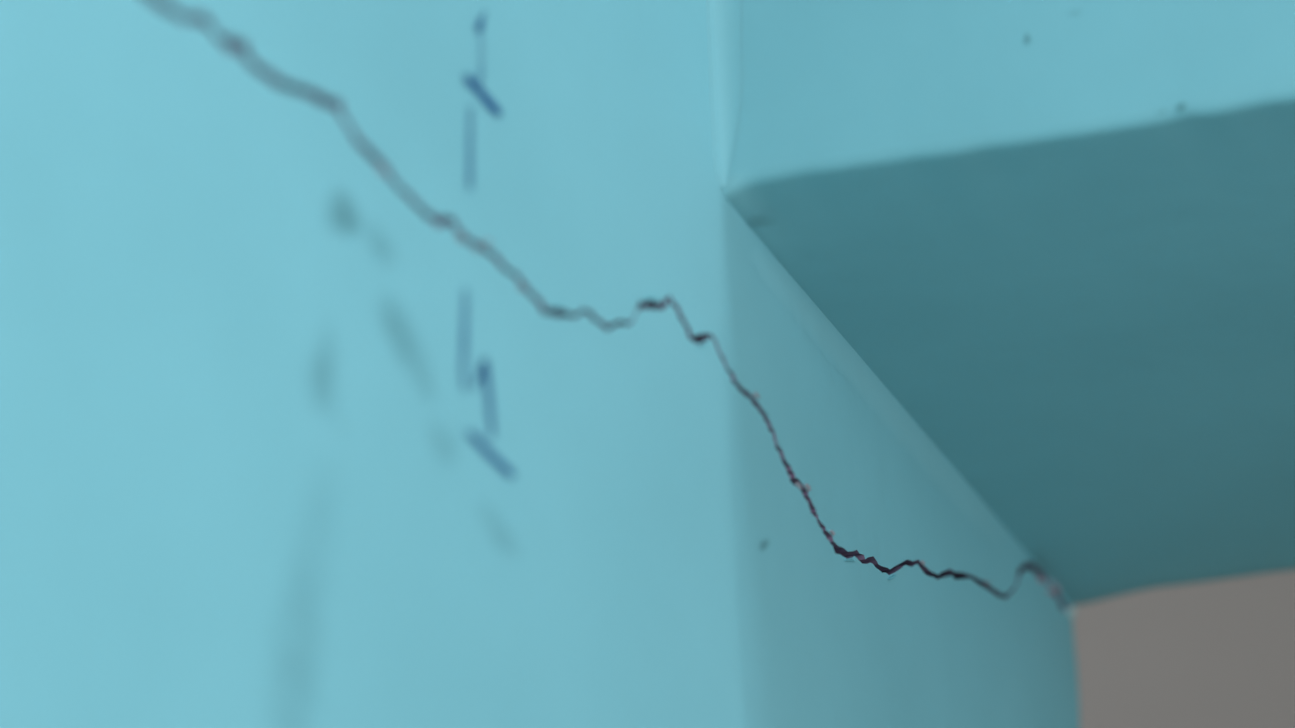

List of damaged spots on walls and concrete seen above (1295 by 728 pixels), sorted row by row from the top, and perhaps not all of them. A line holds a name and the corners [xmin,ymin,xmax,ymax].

crack [149,0,1067,610]